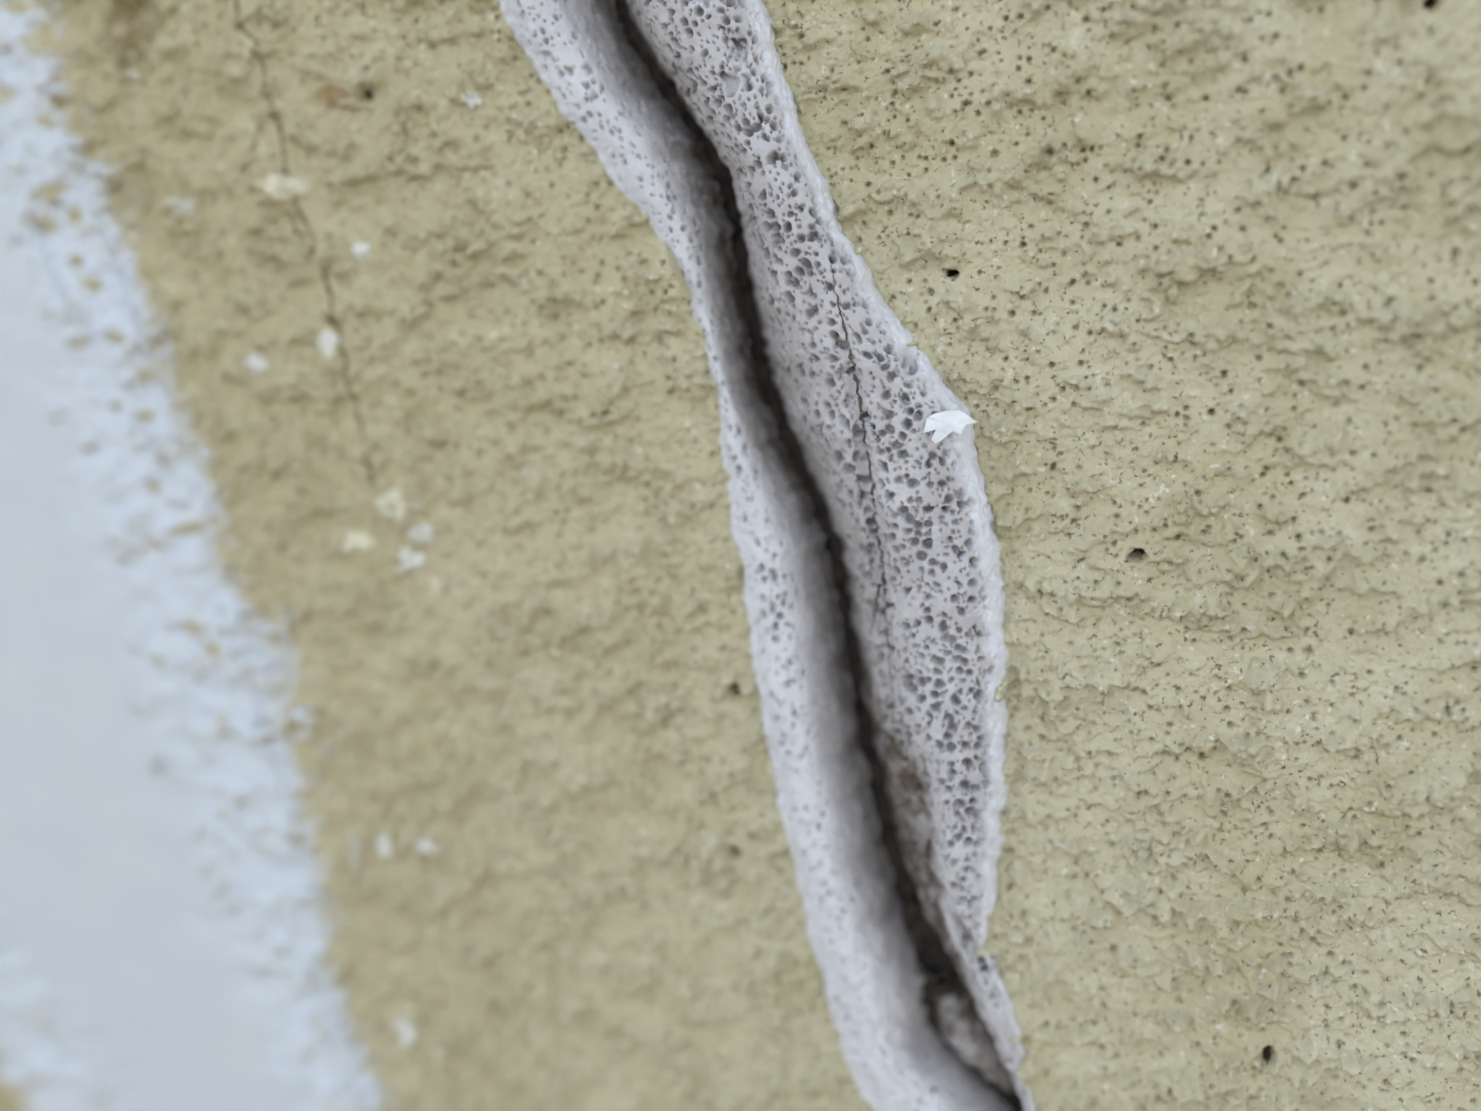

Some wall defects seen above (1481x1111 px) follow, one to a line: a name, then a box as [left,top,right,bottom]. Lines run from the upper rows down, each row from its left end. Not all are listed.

crack [614,0,1025,1111]